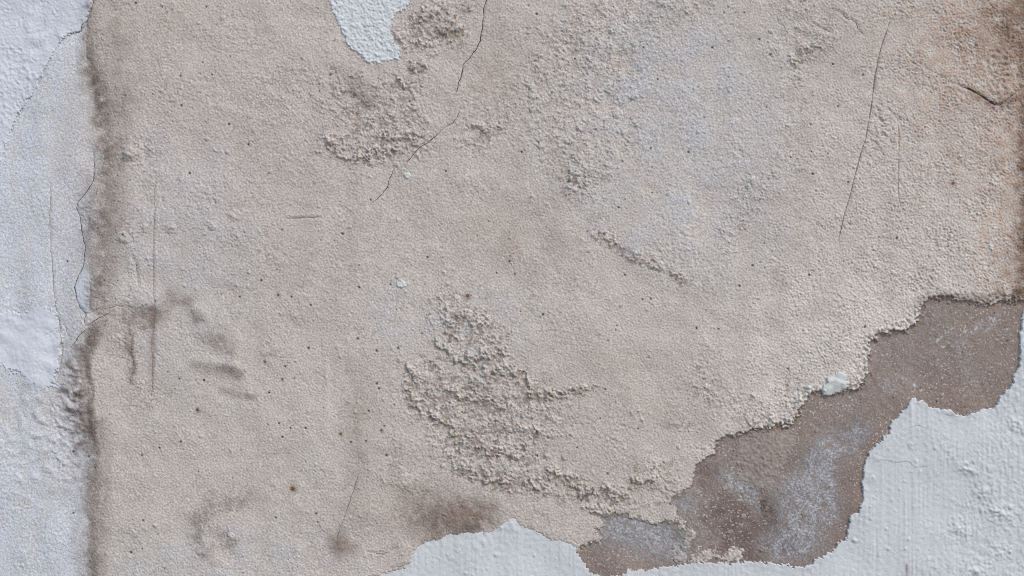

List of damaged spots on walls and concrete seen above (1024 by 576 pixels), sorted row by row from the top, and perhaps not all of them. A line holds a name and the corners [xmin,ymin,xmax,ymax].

peeling [0,0,93,161]
spalling [239,0,479,179]
crack [372,0,487,203]
crack [822,9,890,237]
peeling [0,302,65,388]
water stain [67,330,97,449]
peeling [75,257,91,313]
spalling [374,283,1024,576]